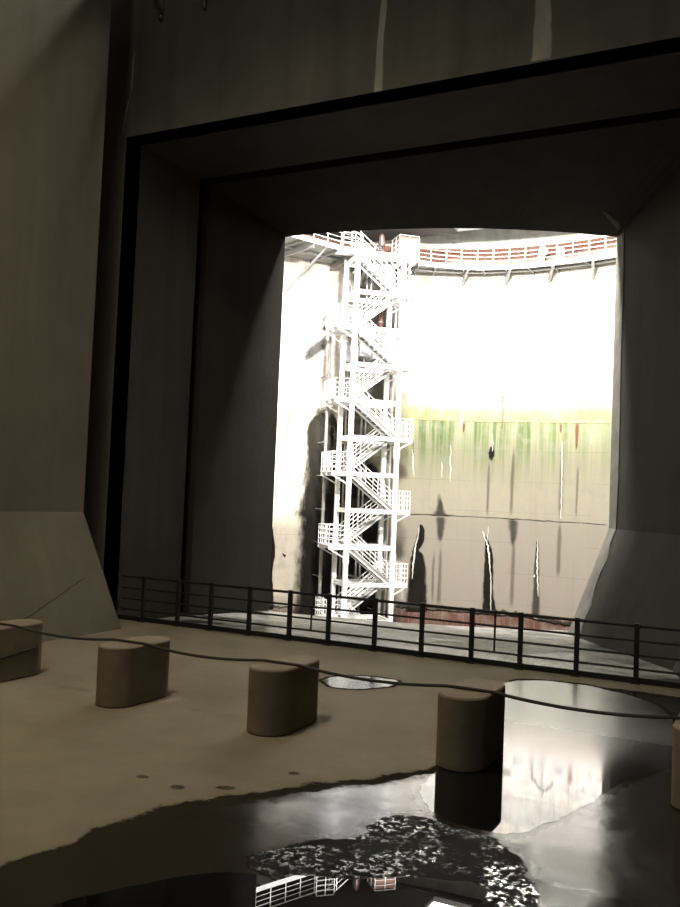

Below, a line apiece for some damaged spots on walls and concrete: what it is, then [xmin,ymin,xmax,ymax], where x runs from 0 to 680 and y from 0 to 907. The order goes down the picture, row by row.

water stain [269,268,400,615]
water stain [436,500,447,539]
water stain [396,525,572,627]
crack [410,448,605,615]